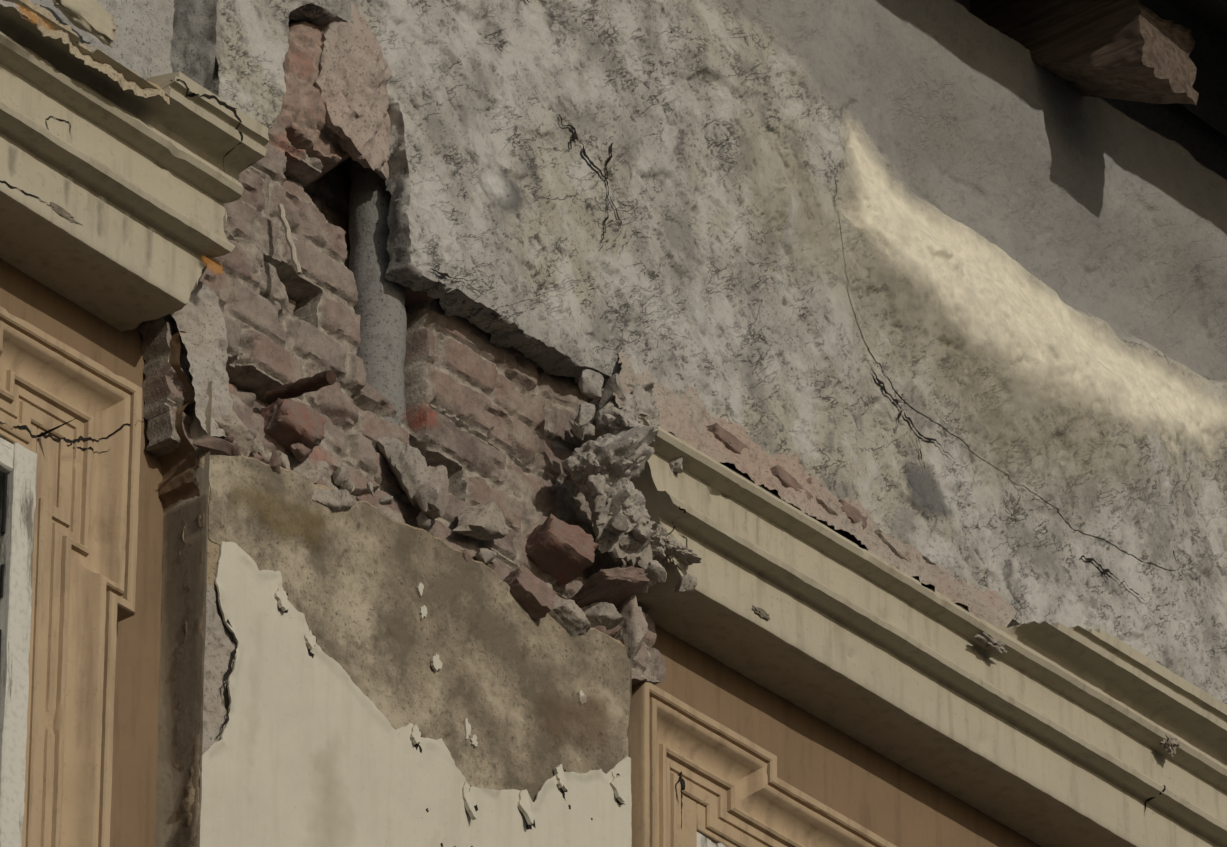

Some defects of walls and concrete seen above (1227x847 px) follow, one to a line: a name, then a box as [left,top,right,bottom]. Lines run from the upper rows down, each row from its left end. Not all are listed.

peeling [52,0,117,56]
crack [0,410,168,453]
spalling [139,2,702,830]
crack [871,367,957,470]
crack [1081,555,1145,601]
spalling [752,605,770,620]